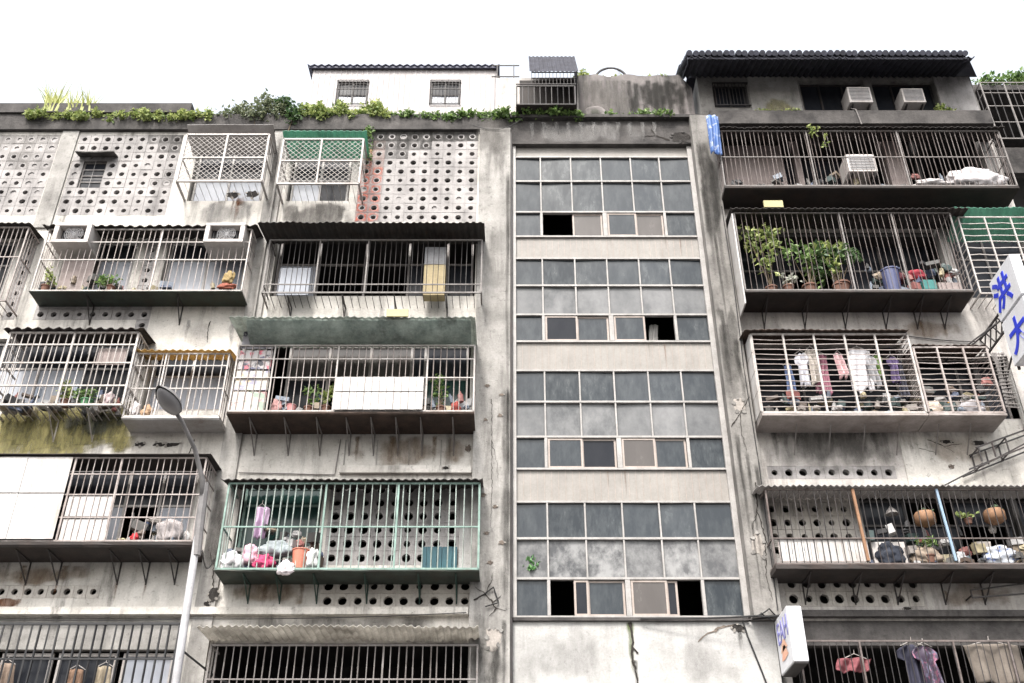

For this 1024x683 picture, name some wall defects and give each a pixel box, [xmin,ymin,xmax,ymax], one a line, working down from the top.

water stain [531,81,688,138]
water stain [66,413,121,435]
crack [473,573,506,616]
crack [627,622,638,683]